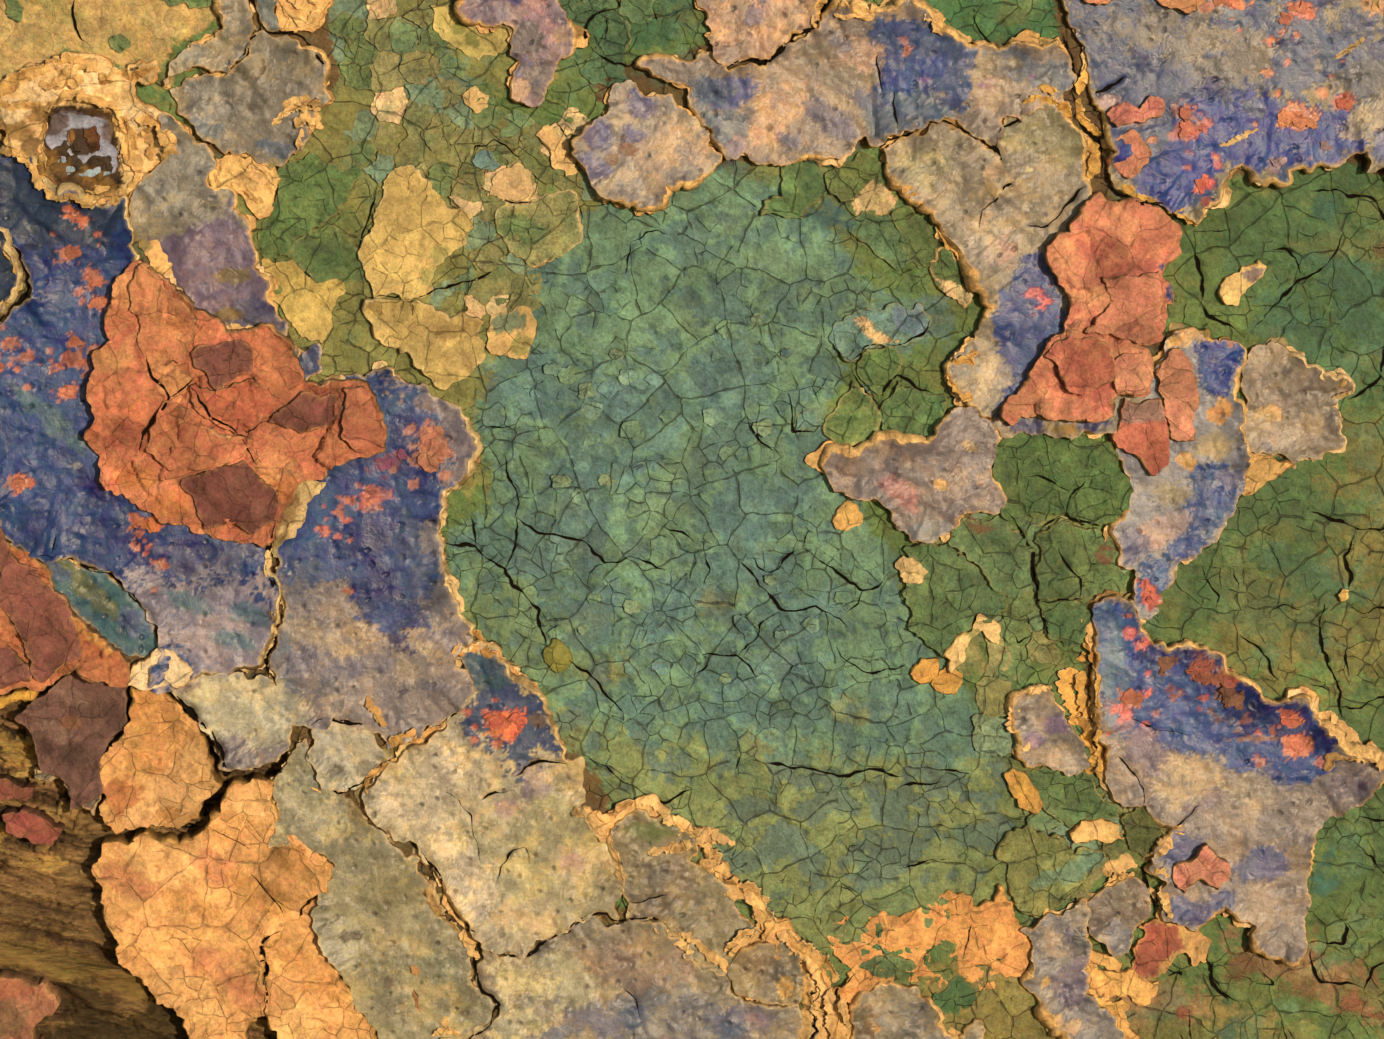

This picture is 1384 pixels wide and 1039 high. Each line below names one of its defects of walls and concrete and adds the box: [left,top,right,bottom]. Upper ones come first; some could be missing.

peeling [1061,0,1384,225]
peeling [1217,259,1267,306]
peeling [0,0,541,835]
crack [446,424,665,721]
peeling [91,0,1167,1039]
crack [646,515,905,677]
crack [1001,445,1099,646]
peeling [948,322,1384,967]
crack [1269,511,1384,716]
crack [437,759,692,884]
crack [736,740,971,800]
peeling [1019,869,1212,1039]